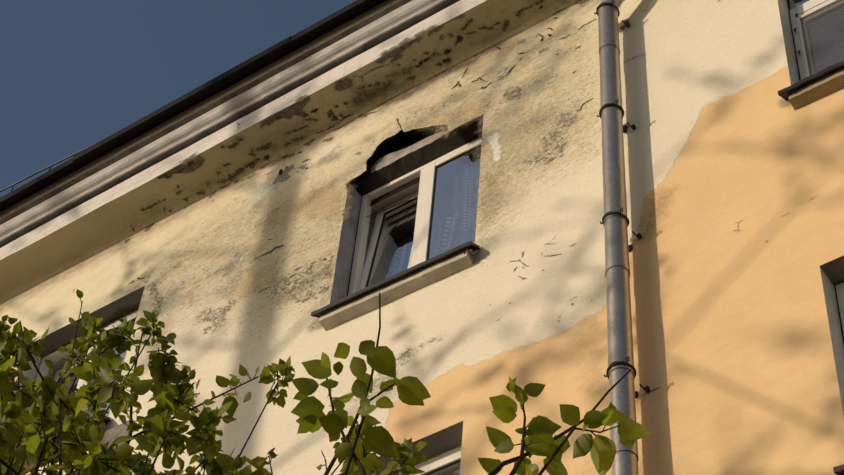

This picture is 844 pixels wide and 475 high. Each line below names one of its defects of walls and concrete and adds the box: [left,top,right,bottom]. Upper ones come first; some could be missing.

peeling [327,0,544,121]
spalling [197,95,341,198]
spalling [523,109,580,166]
spalling [157,153,204,208]
spalling [193,253,256,334]
spalling [271,255,334,303]
spalling [355,335,442,401]